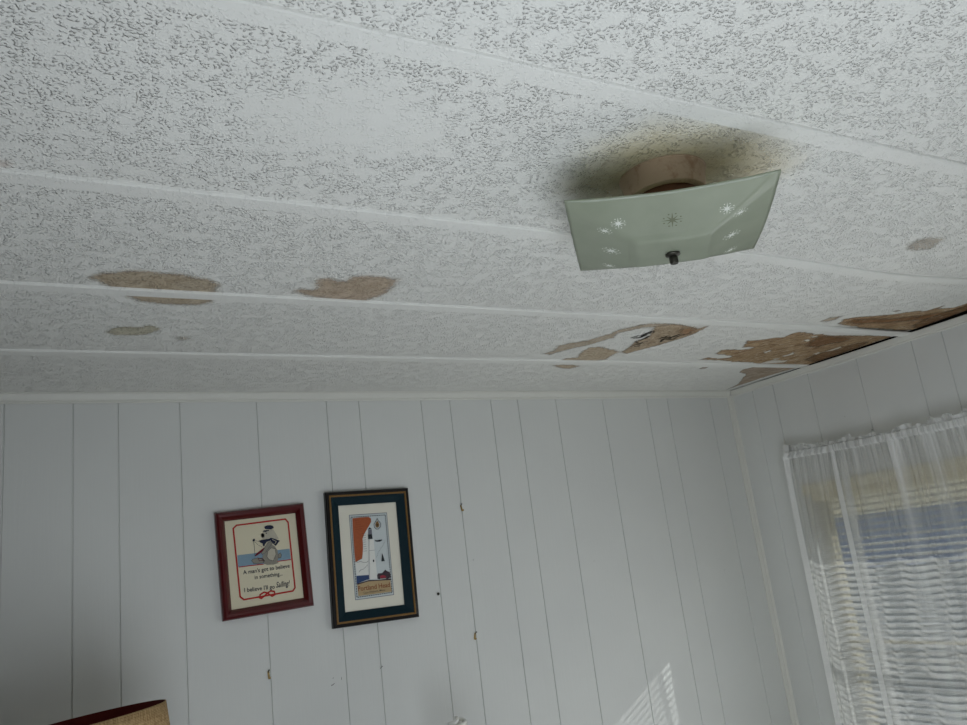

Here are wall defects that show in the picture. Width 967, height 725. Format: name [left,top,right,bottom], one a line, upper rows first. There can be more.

peeling [701,304,967,388]